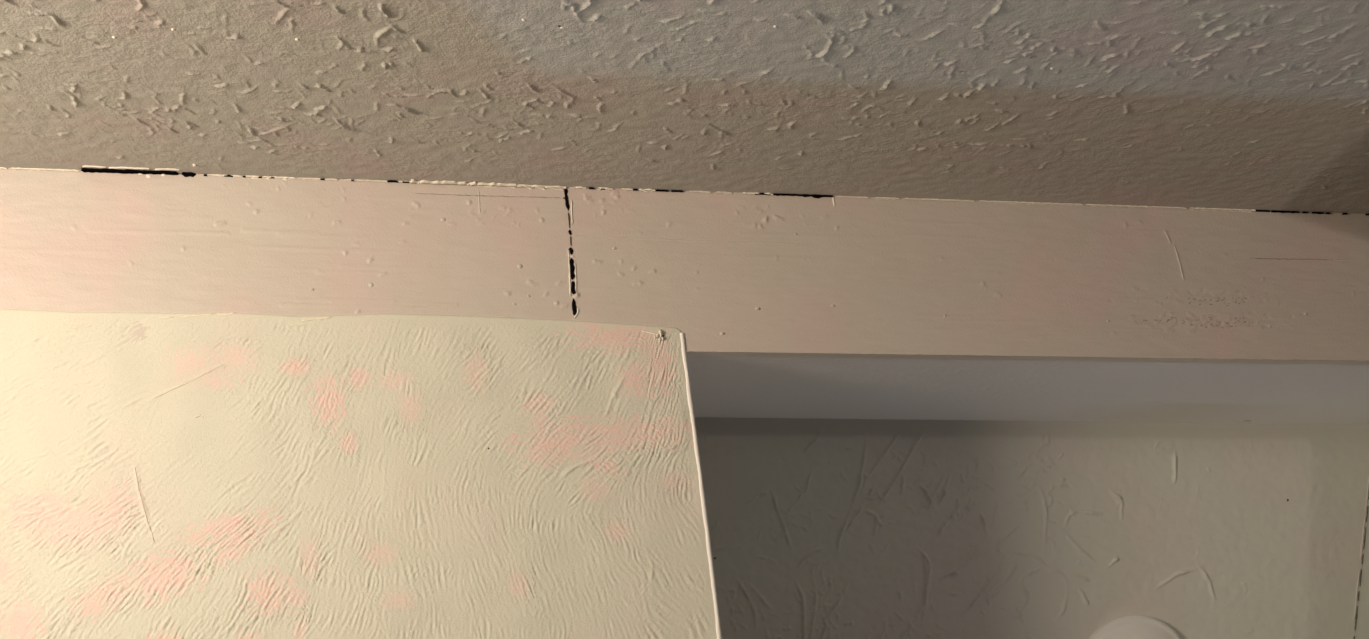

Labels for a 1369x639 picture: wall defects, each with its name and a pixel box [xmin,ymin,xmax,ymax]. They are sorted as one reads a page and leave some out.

crack [755,192,833,200]
crack [1255,209,1369,217]
crack [563,187,683,318]